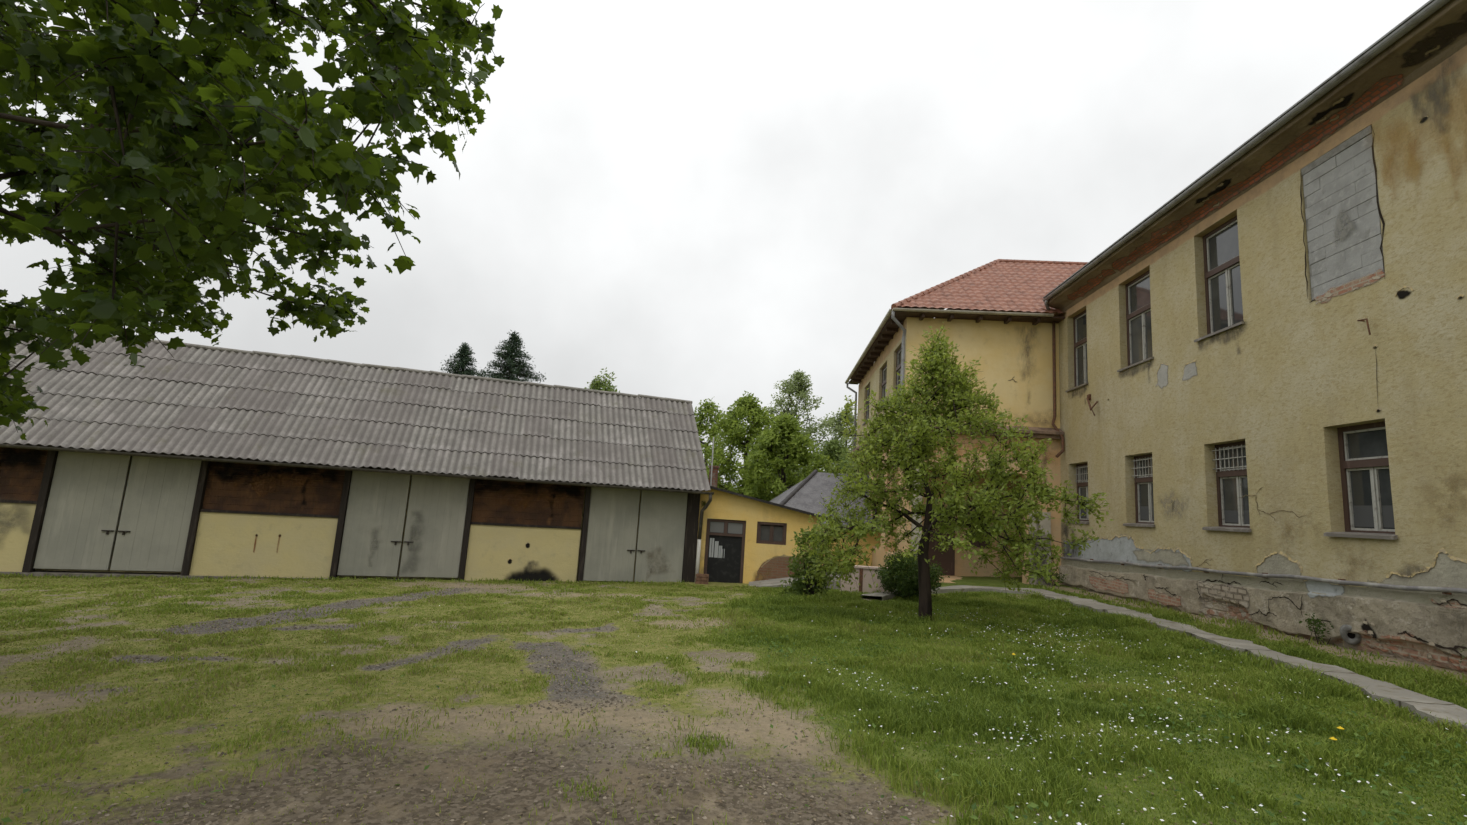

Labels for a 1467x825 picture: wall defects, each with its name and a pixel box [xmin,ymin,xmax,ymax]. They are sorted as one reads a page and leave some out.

flaking render [1067,12,1467,304]
crack [1239,487,1306,520]
peeling [1063,534,1344,609]
peeling [1368,548,1467,609]
crack [1432,598,1467,606]
spalling [1358,619,1449,663]
crack [1397,631,1467,656]